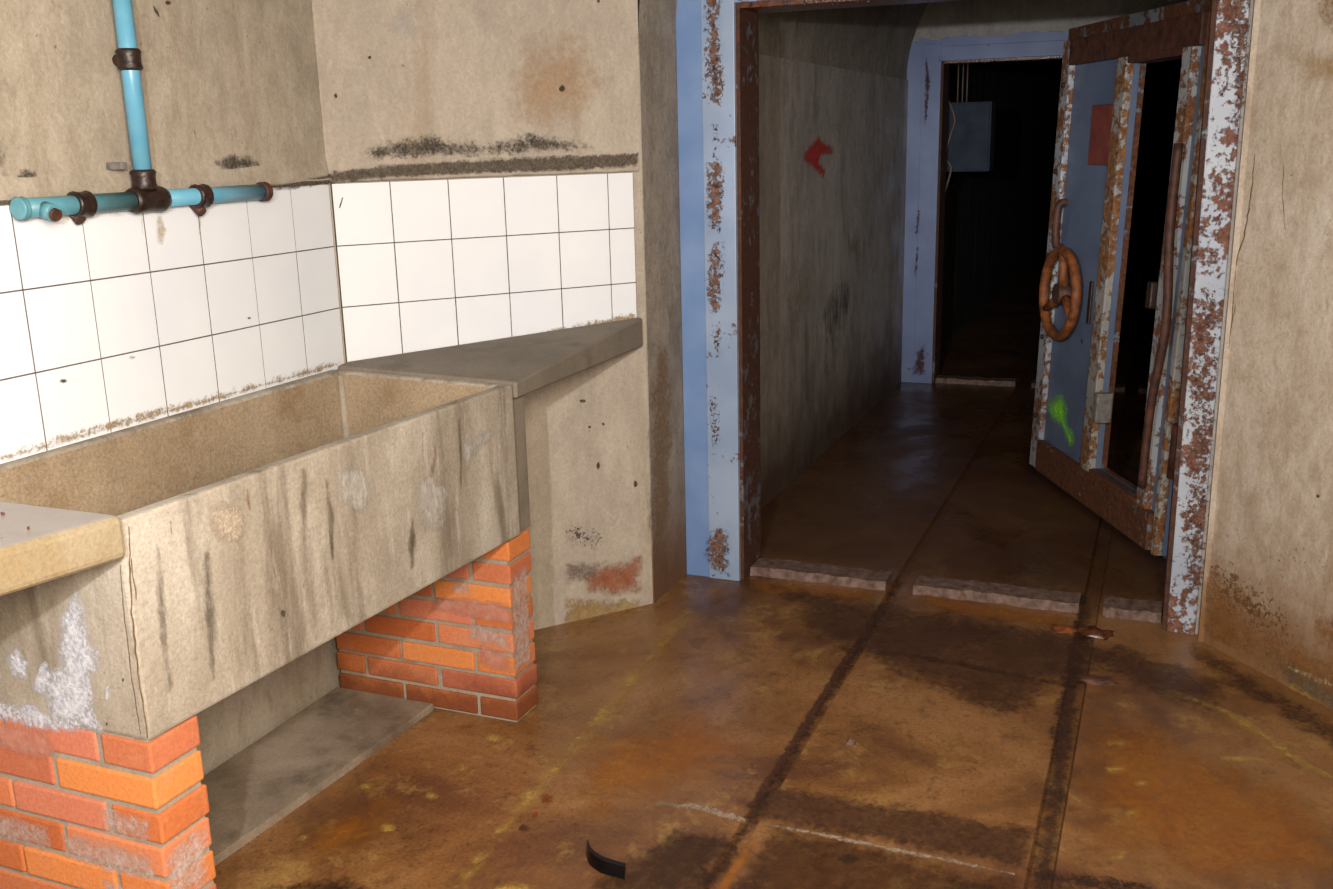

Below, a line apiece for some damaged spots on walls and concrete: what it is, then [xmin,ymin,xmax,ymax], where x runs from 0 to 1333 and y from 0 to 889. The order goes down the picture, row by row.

corrosion [703,0,724,106]
corrosion [1227,0,1252,121]
water stain [371,133,577,159]
corrosion [705,124,725,357]
corrosion [570,558,640,593]
efflorescence [0,591,109,757]